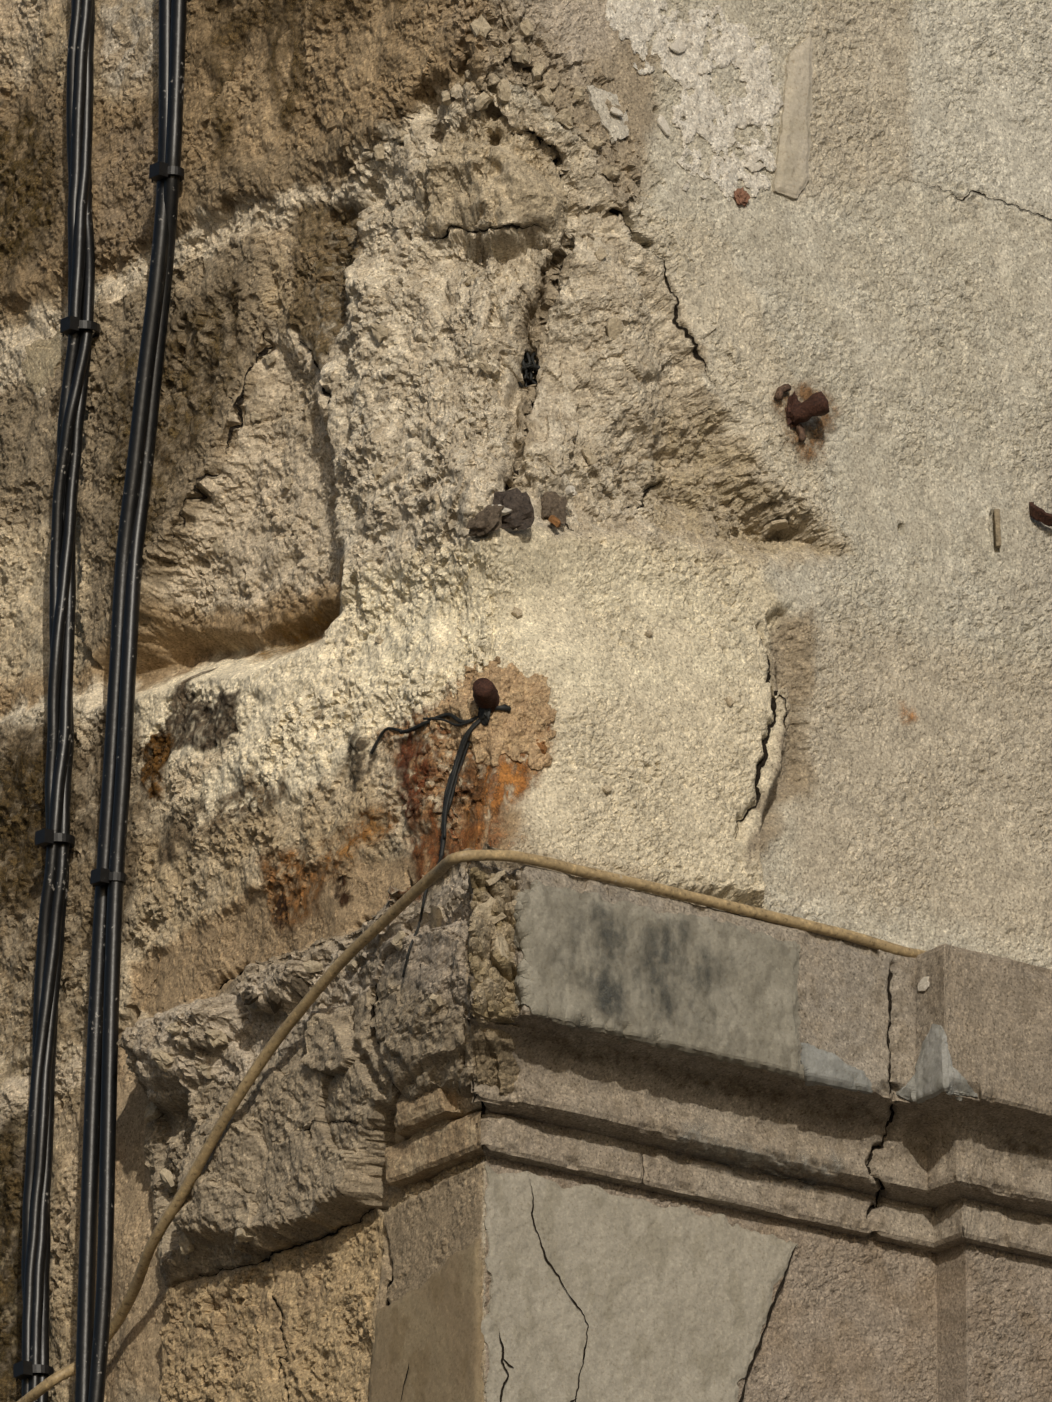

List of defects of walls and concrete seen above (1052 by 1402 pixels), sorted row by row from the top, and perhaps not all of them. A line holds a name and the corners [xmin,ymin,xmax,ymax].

crack [171,331,331,538]
spalling [135,0,851,691]
crack [608,208,716,387]
rust [775,382,838,460]
rust [1029,502,1052,526]
spalling [89,641,110,700]
rust [260,708,539,929]
crack [735,632,787,838]
spalling [123,867,873,1287]
crack [866,969,894,1218]
flaking render [896,1024,978,1104]
crack [739,1245,797,1402]